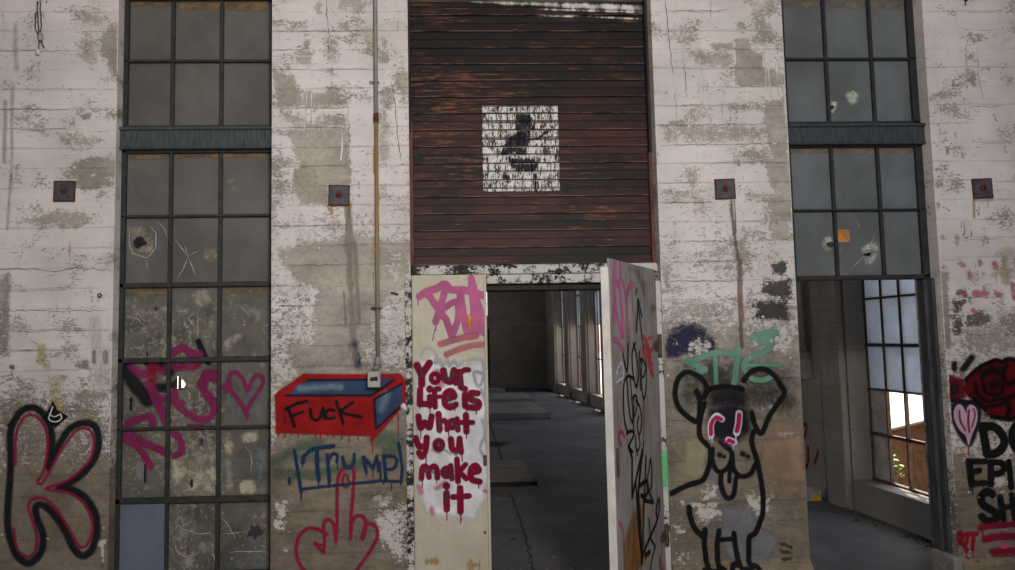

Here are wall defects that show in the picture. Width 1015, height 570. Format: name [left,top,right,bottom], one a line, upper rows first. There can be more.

peeling [294,37,343,66]
peeling [494,1,641,19]
peeling [273,68,408,207]
corrosion [714,179,744,349]
corrosion [971,178,994,217]
peeling [271,206,410,570]